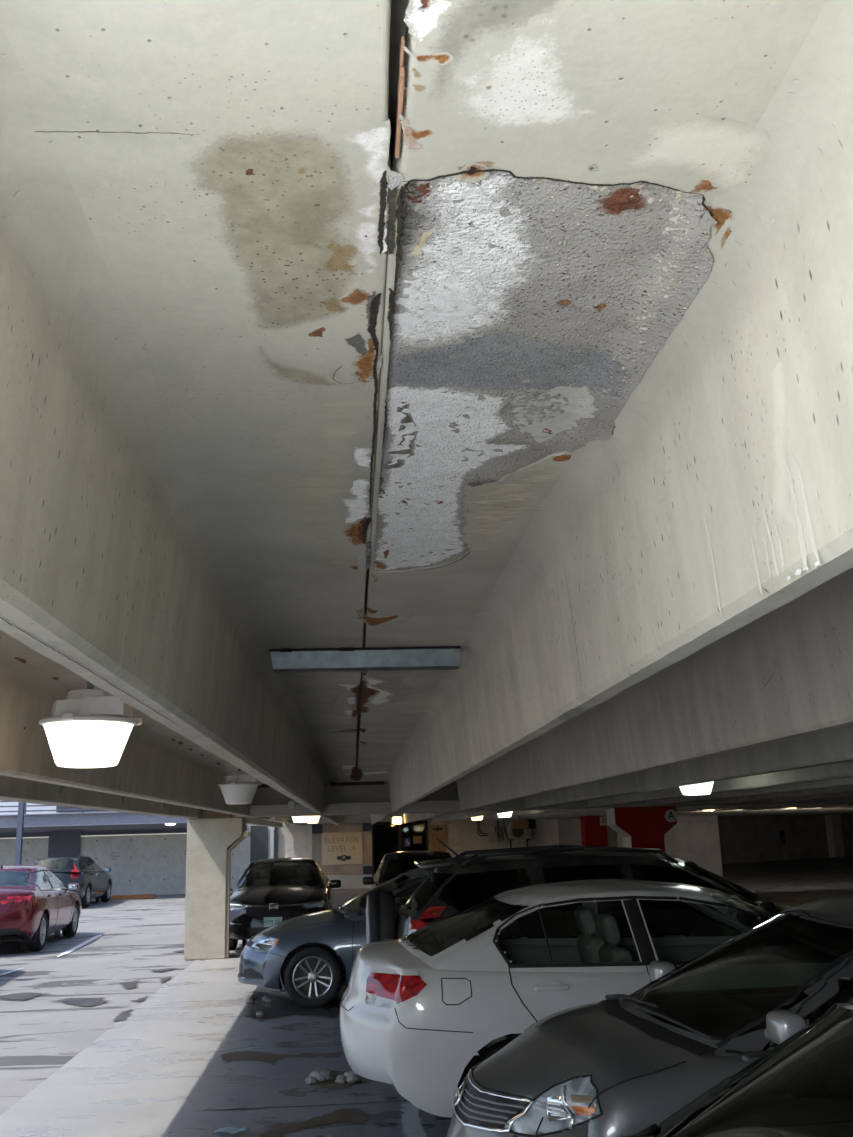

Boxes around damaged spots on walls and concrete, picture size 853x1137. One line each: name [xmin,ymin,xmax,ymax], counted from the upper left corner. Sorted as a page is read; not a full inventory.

rust [399,113,435,149]
damp [403,0,600,133]
rust [593,185,652,218]
rust [685,179,735,241]
crack [362,288,395,540]
damp [178,119,635,571]
spalling [375,176,718,571]
crack [337,671,363,777]